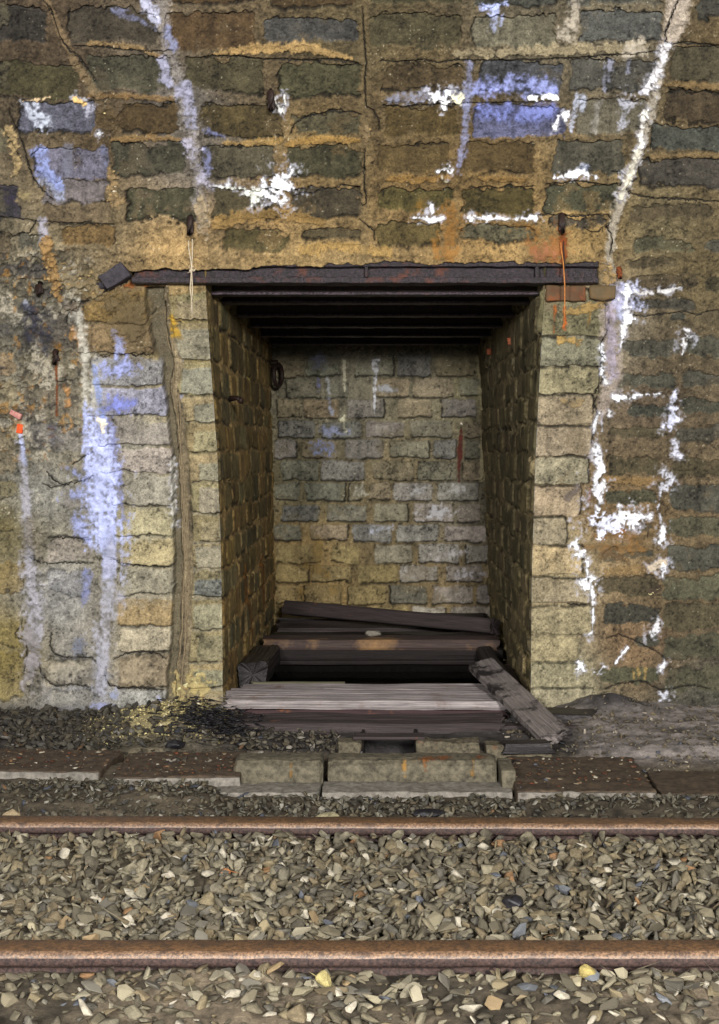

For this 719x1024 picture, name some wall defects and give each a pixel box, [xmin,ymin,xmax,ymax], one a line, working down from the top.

damp [557,0,579,41]
damp [111,0,295,207]
damp [428,38,647,183]
damp [618,110,649,200]
damp [642,44,671,95]
damp [413,204,444,223]
damp [467,215,538,223]
damp [593,282,683,459]
damp [70,299,136,710]
damp [588,445,674,544]
damp [570,539,596,636]
crack [606,680,709,691]